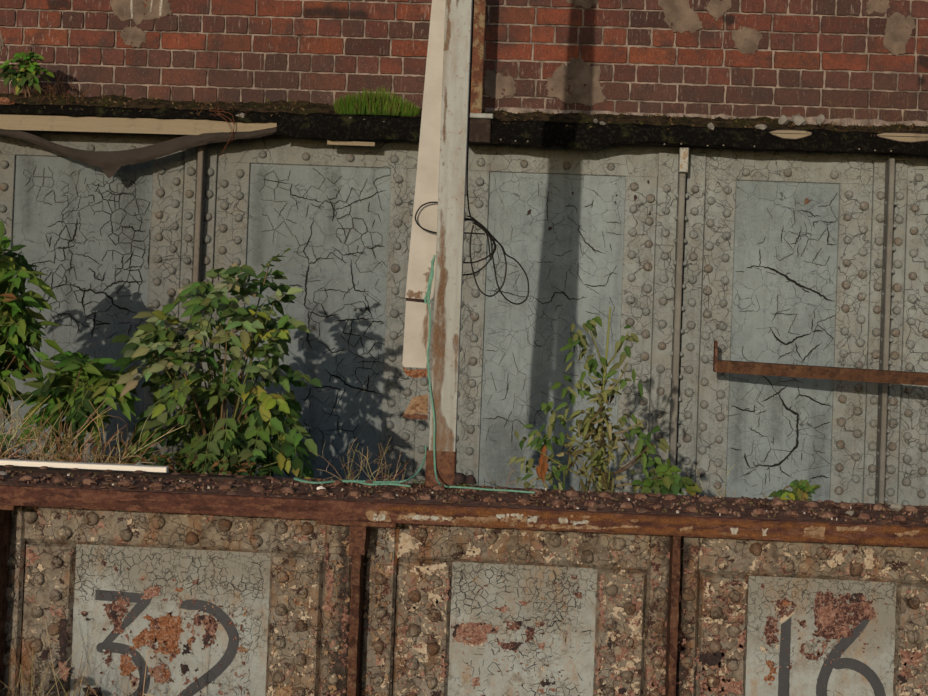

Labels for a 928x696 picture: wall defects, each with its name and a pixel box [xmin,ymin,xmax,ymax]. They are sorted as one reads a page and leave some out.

rust [444,0,458,50]
crack [23,166,185,339]
crack [221,168,409,448]
crack [459,182,869,492]
crack [902,199,928,491]
crack [74,547,264,695]
peeling [270,531,352,696]
crack [452,564,592,696]
peeling [359,510,888,696]
rust [379,506,928,696]
peeling [804,548,928,696]